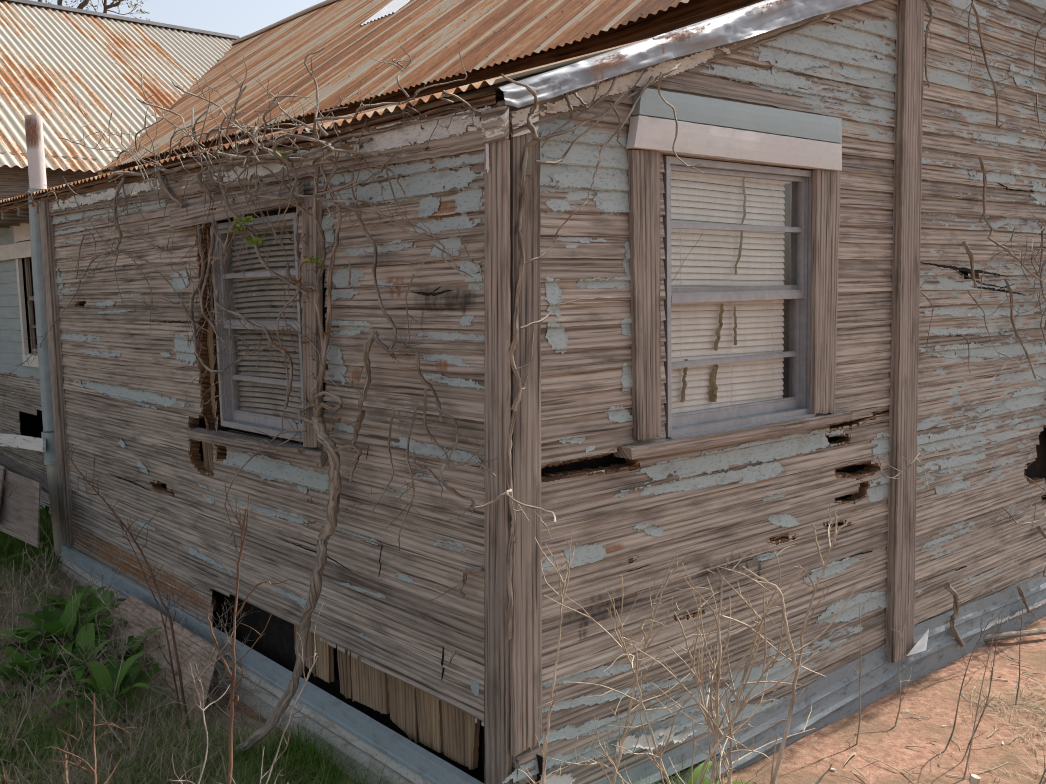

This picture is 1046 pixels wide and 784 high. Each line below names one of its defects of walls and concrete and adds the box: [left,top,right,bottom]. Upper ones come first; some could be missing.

rust [591,52,629,83]
rust [655,23,712,53]
peeling [540,17,898,116]
rust [25,118,41,147]
peeling [213,106,491,182]
peeling [540,127,635,218]
peeling [52,179,187,244]
peeling [310,143,490,403]
crack [920,262,1025,295]
spalling [541,436,626,476]
peeling [613,421,852,497]
peeling [1001,386,1046,483]